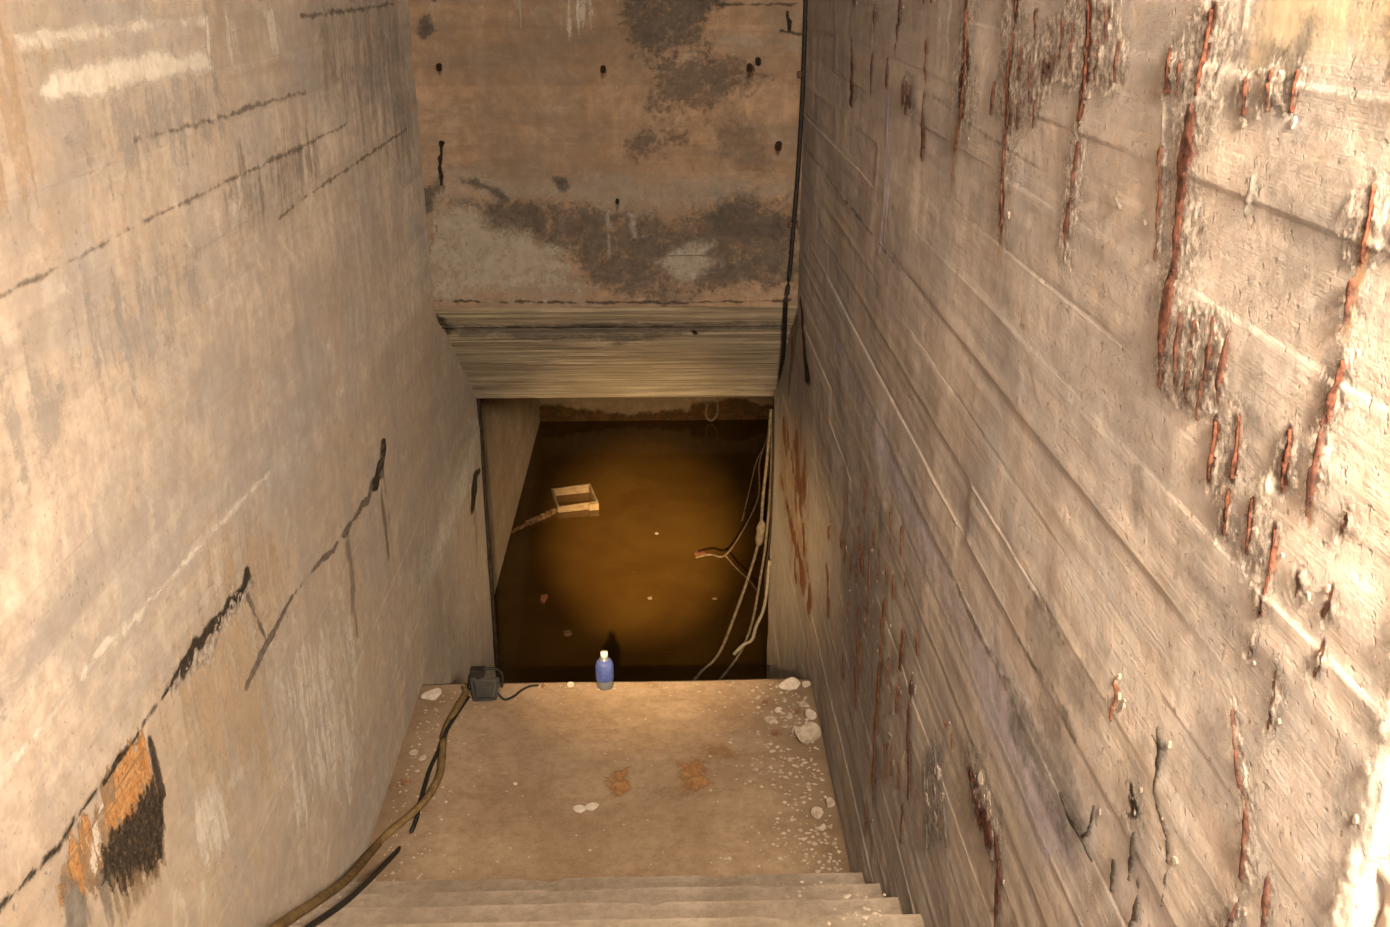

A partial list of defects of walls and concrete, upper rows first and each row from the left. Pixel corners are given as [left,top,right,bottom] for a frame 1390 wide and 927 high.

damp [620,0,719,63]
damp [424,177,800,334]
rust [781,416,812,617]
crack [1198,158,1390,927]
crack [0,438,390,913]
rust [864,639,916,844]
crack [1059,726,1179,927]
spalling [1327,691,1390,927]